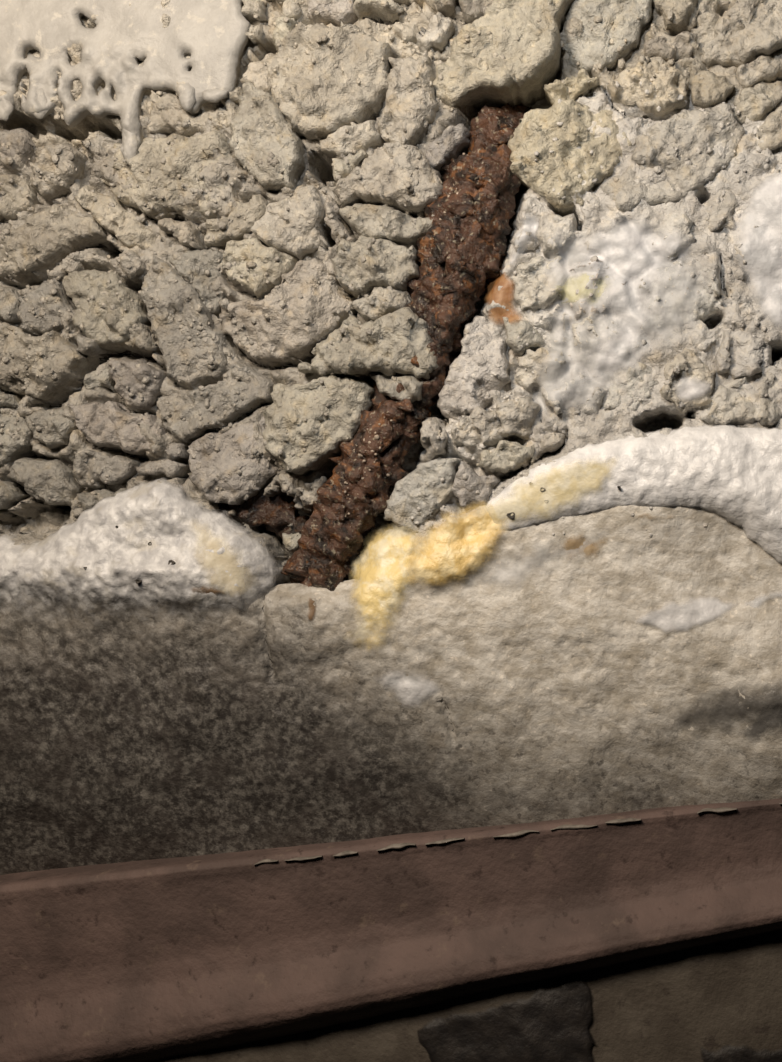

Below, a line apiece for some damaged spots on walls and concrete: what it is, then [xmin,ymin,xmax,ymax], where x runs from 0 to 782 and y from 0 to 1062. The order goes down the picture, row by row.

crack [147,214,210,250]
efflorescence [511,216,538,261]
efflorescence [737,172,782,323]
crack [37,329,163,414]
crack [238,338,327,370]
spalling [0,0,782,586]
rust [487,269,519,322]
efflorescence [536,222,698,408]
rust [354,506,501,640]